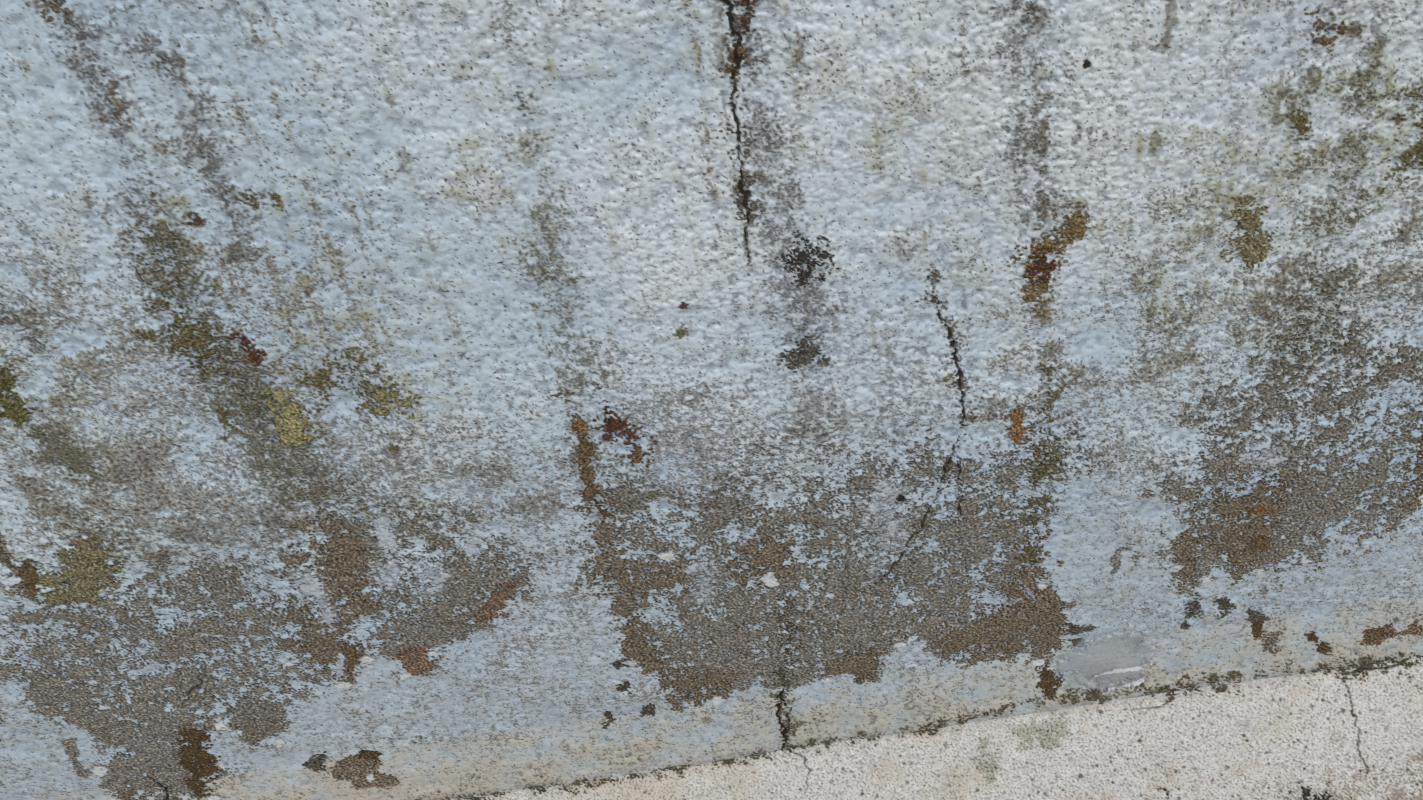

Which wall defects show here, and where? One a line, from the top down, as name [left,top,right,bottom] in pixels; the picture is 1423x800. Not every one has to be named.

leakage [58,1,129,137]
leakage [176,95,256,260]
leakage [106,157,343,512]
leakage [520,193,582,285]
crack [719,0,764,265]
rust [1007,203,1102,318]
leakage [1275,136,1375,366]
leakage [2,406,117,487]
rust [573,384,657,467]
crack [871,264,978,590]
leakage [1014,360,1074,563]
crack [770,676,811,771]